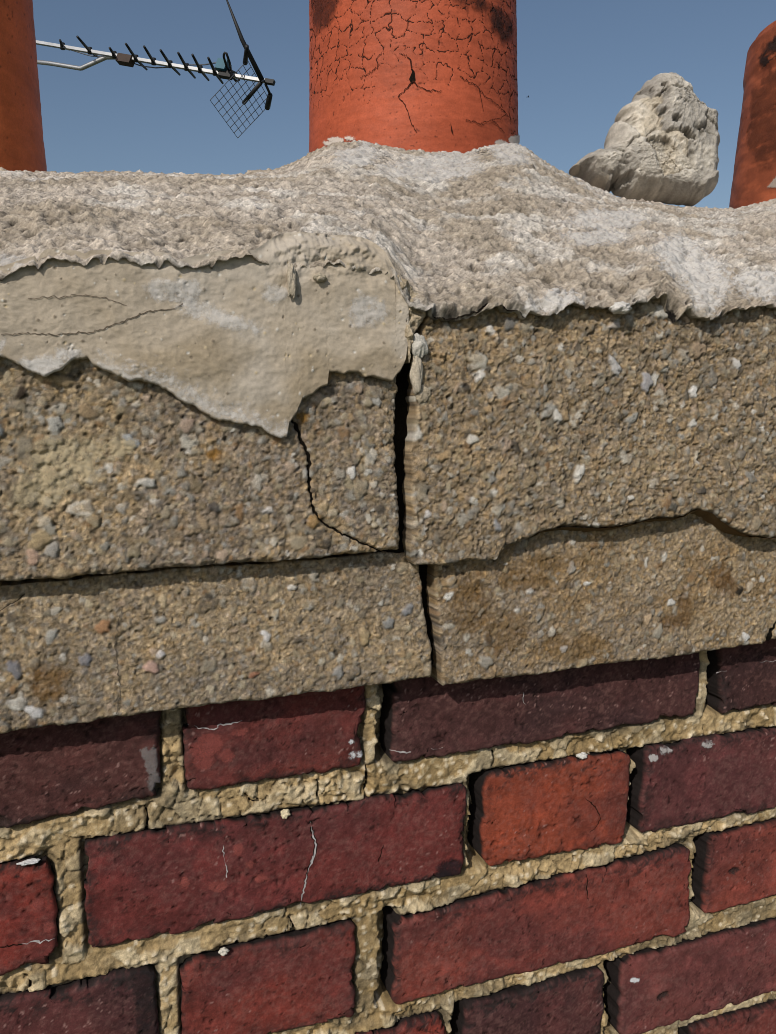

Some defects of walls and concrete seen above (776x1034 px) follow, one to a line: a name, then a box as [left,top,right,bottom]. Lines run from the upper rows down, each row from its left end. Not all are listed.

crack [309,0,518,136]
peeling [0,232,409,438]
crack [291,349,434,664]
crack [764,622,776,662]
crack [288,821,318,927]